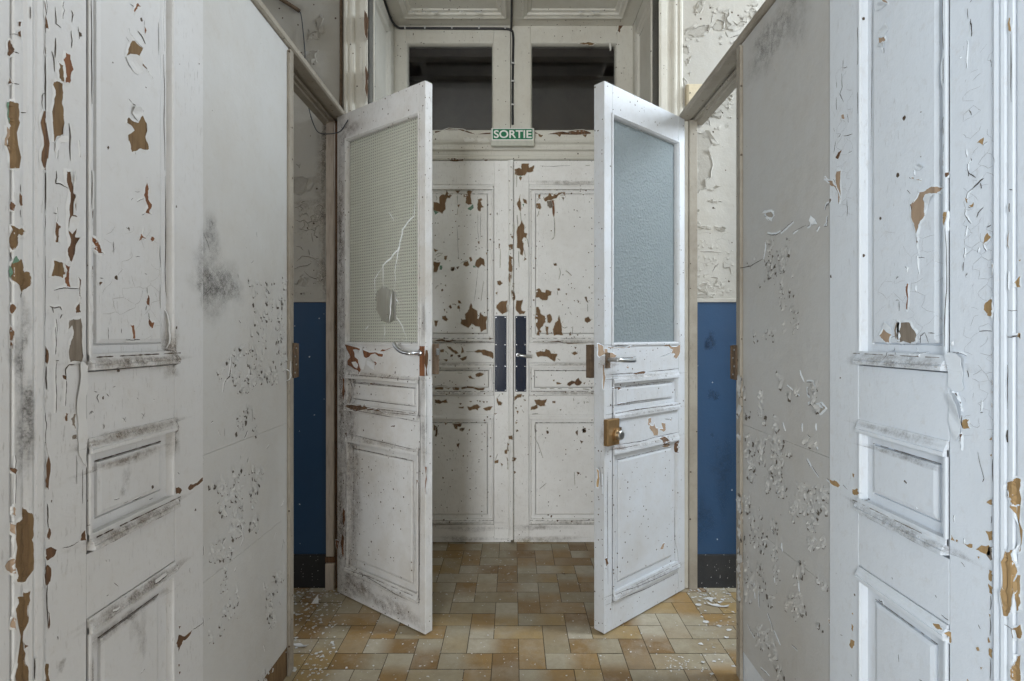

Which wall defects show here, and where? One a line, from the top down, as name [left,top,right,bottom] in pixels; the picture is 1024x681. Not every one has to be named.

peeling [2,98,26,171]
peeling [7,184,34,349]
peeling [38,0,114,467]
peeling [125,99,150,154]
peeling [342,163,681,495]
peeling [697,94,735,232]
peeling [683,0,759,87]
crack [875,0,994,430]
peeling [878,164,995,451]
peeling [3,413,89,681]
peeling [695,371,870,633]
peeling [950,430,1024,681]